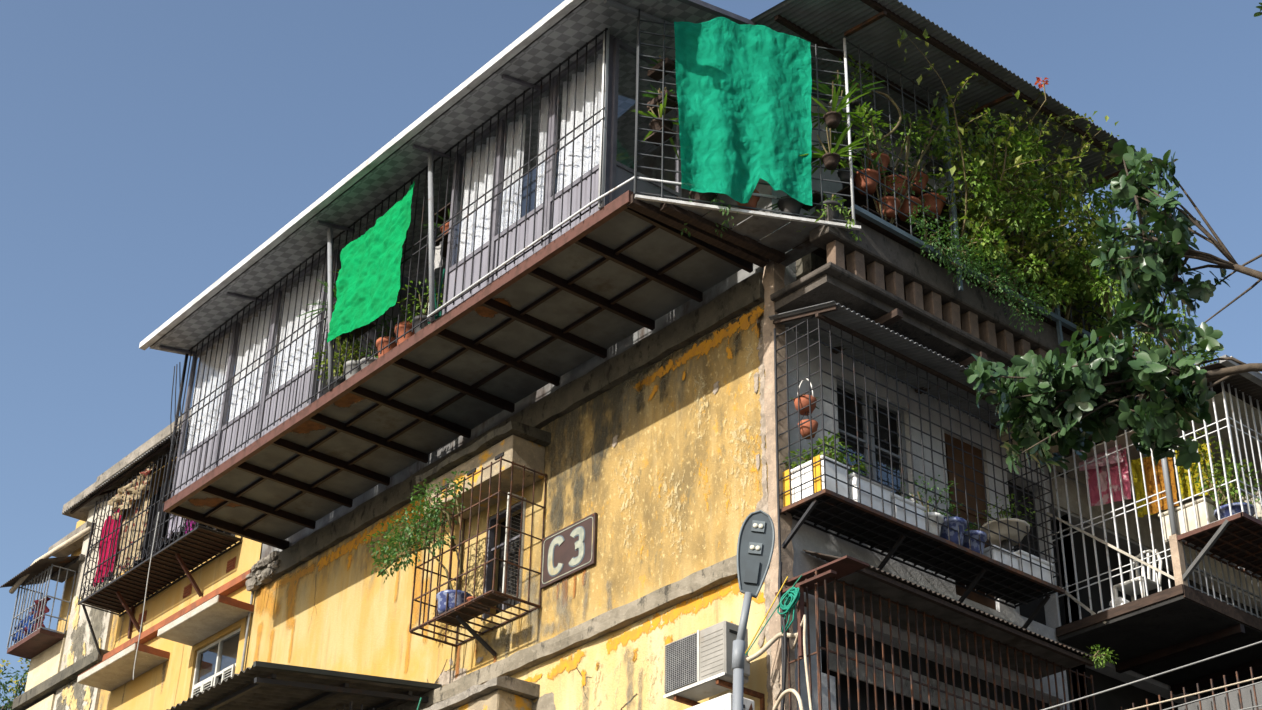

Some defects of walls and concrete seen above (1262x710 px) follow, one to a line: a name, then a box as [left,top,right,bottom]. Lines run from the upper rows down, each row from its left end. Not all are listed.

leakage [546,310,756,551]
peeling [633,305,769,514]
peeling [61,685,91,710]
peeling [63,596,101,668]
peeling [524,568,780,710]